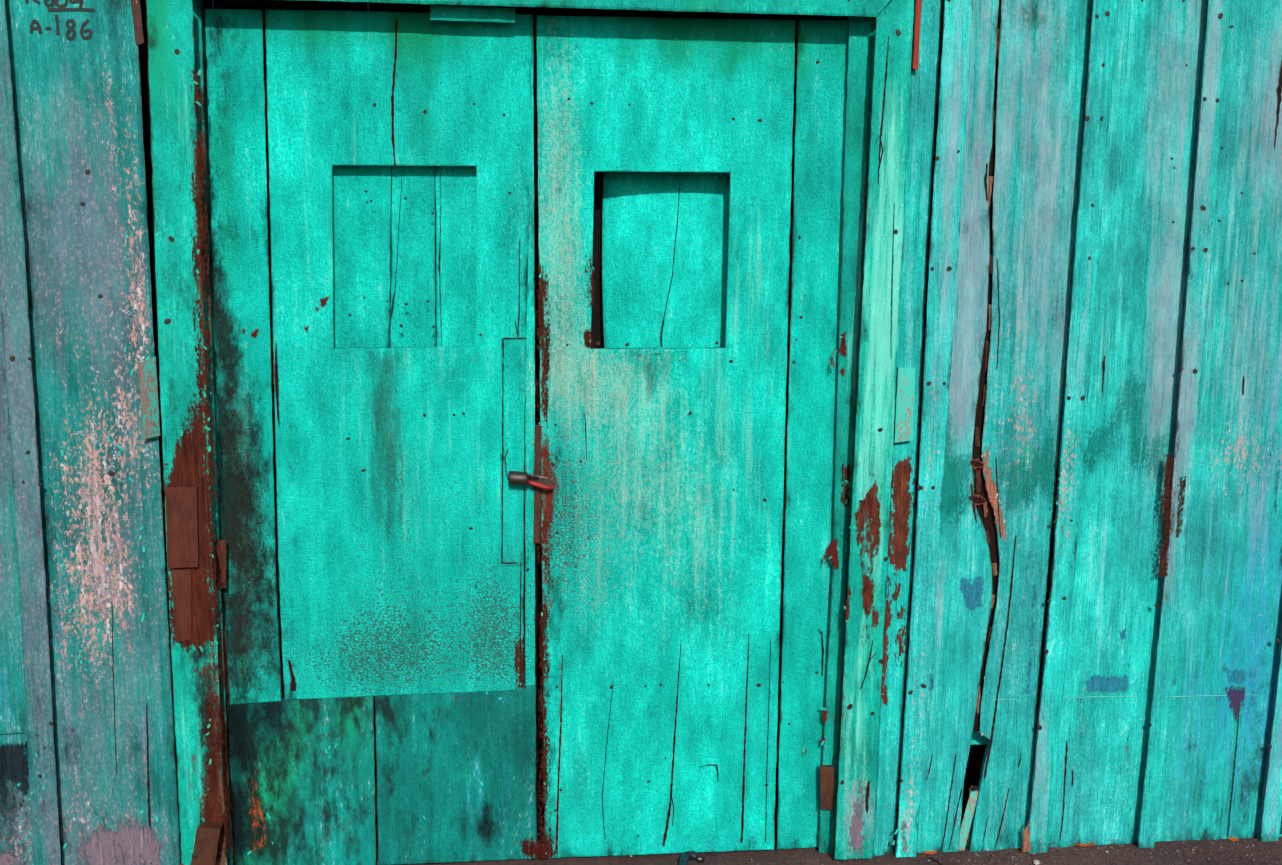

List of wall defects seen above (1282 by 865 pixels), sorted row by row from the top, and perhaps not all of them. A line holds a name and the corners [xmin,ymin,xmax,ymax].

crack [1274,61,1282,148]
crack [926,0,1022,850]
peeling [69,463,122,618]
rust [541,433,558,553]
rust [525,837,558,860]